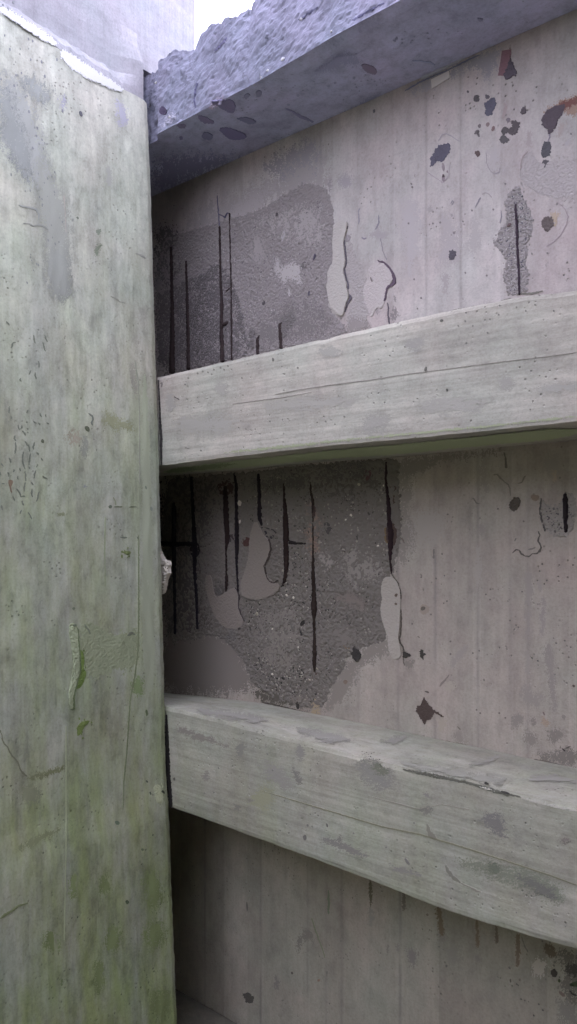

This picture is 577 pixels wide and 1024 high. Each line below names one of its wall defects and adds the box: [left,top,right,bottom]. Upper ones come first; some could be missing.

spalling [154,182,393,385]
crack [344,208,396,324]
spalling [492,151,577,312]
spalling [150,458,413,713]
crack [403,769,521,797]